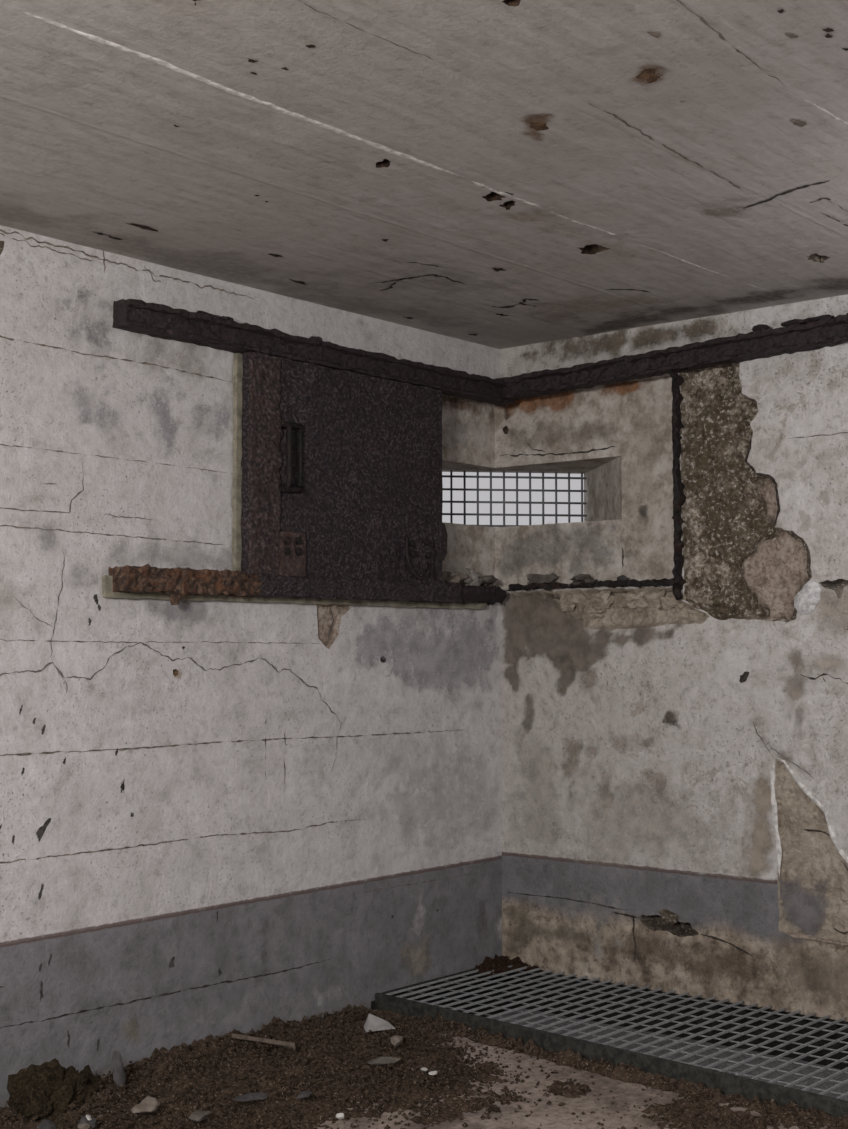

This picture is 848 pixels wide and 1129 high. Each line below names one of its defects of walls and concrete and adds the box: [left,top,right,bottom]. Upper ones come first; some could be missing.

crack [588,103,848,226]
crack [0,229,258,299]
spalling [506,363,848,631]
crack [0,444,458,772]
spalling [317,604,350,650]
leakage [357,589,680,731]
crack [0,819,364,864]
flaking render [770,757,848,946]
crack [1,958,332,1028]